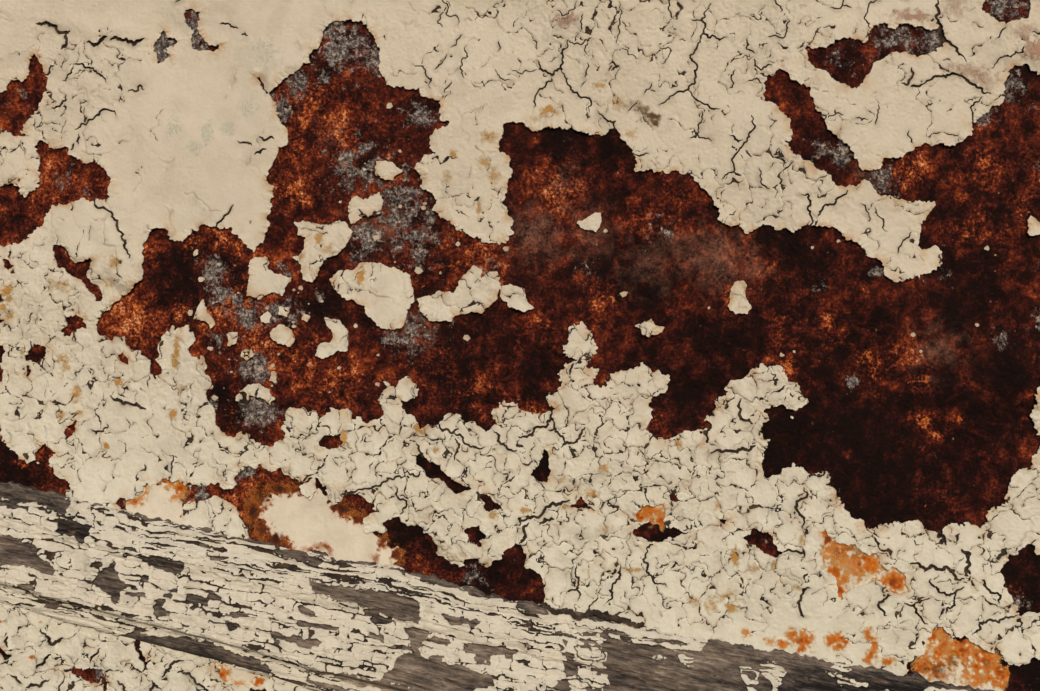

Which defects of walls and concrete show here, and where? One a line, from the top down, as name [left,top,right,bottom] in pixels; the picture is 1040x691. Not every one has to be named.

peeling [0,140,111,270]
crack [0,21,149,184]
crack [238,136,274,154]
crack [392,0,1040,280]
peeling [53,19,1040,532]
crack [0,198,1040,691]
corrosion [244,483,302,551]
peeling [116,464,545,604]
corrosion [330,503,367,524]
corrosion [820,530,909,600]
peeling [1000,543,1040,616]
corrosion [913,627,1010,689]